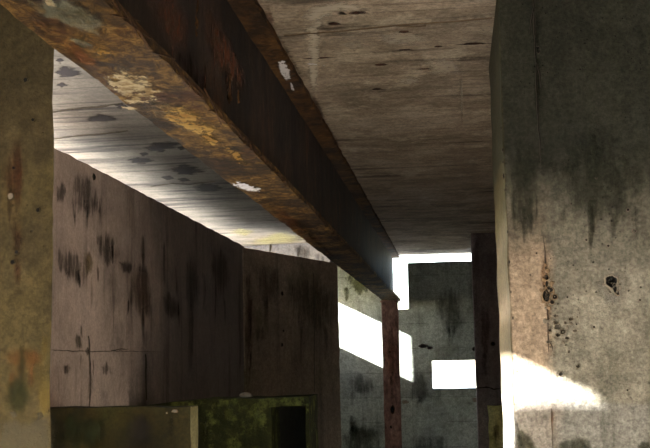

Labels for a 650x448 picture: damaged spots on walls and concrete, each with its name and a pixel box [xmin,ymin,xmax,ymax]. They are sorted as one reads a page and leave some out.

water stain [58,252,84,285]
water stain [100,237,114,267]
spalling [602,271,622,296]
spalling [539,263,578,357]
crack [54,336,155,406]